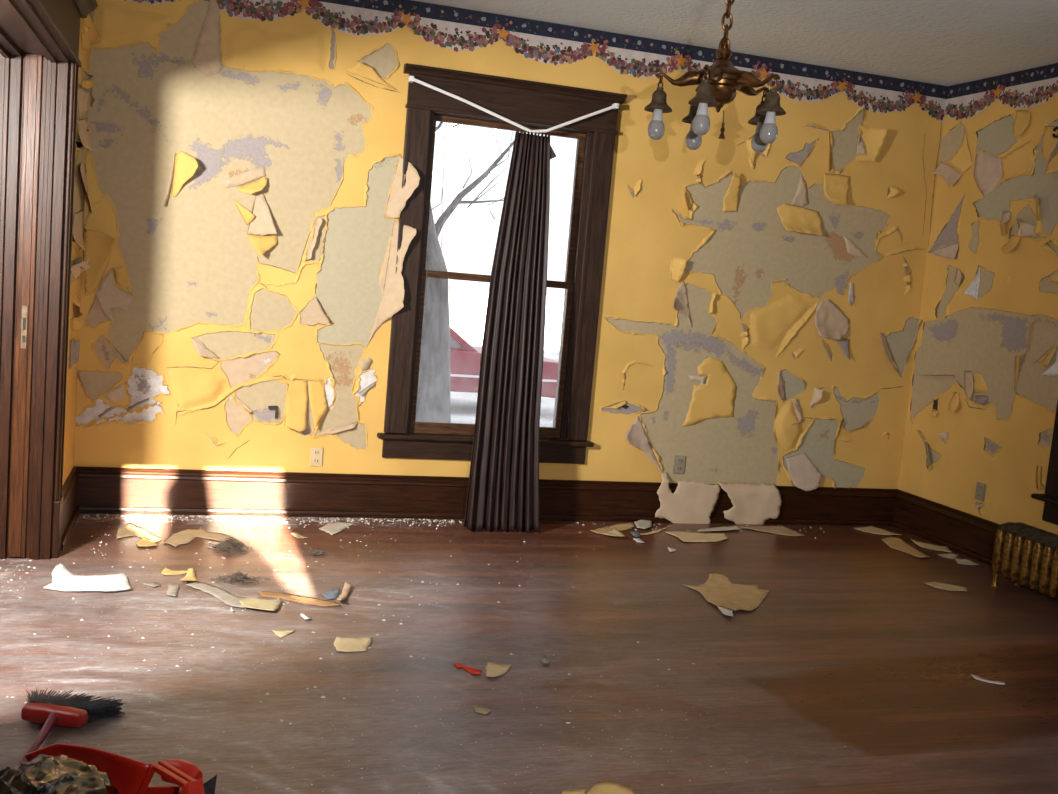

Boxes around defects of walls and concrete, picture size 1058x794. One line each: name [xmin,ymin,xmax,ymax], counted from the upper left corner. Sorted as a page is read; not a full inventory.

peeling [69,0,400,451]
peeling [602,107,891,491]
peeling [879,110,1058,449]